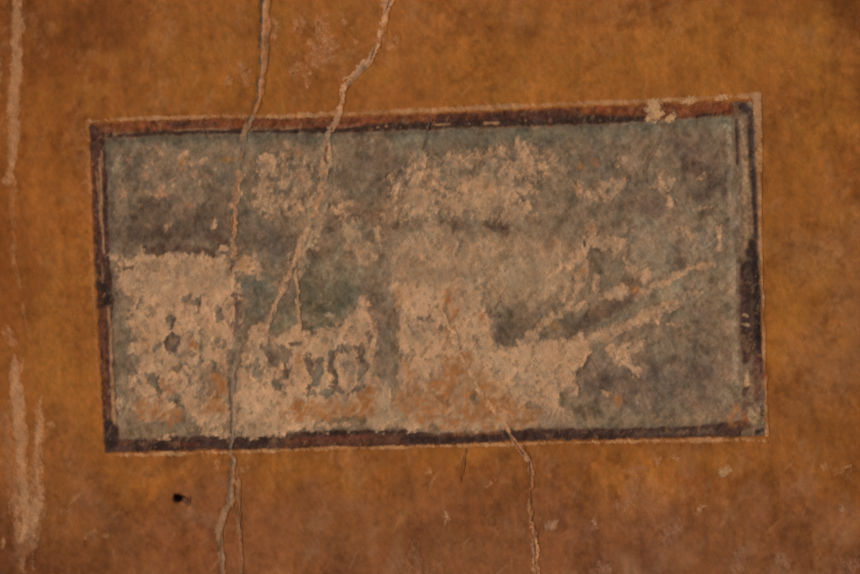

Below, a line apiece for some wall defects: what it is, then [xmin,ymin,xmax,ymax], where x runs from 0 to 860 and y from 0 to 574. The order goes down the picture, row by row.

peeling [643,94,698,124]
leakage [0,0,56,574]
crack [213,0,395,574]
peeling [106,134,725,442]
crack [440,306,541,574]